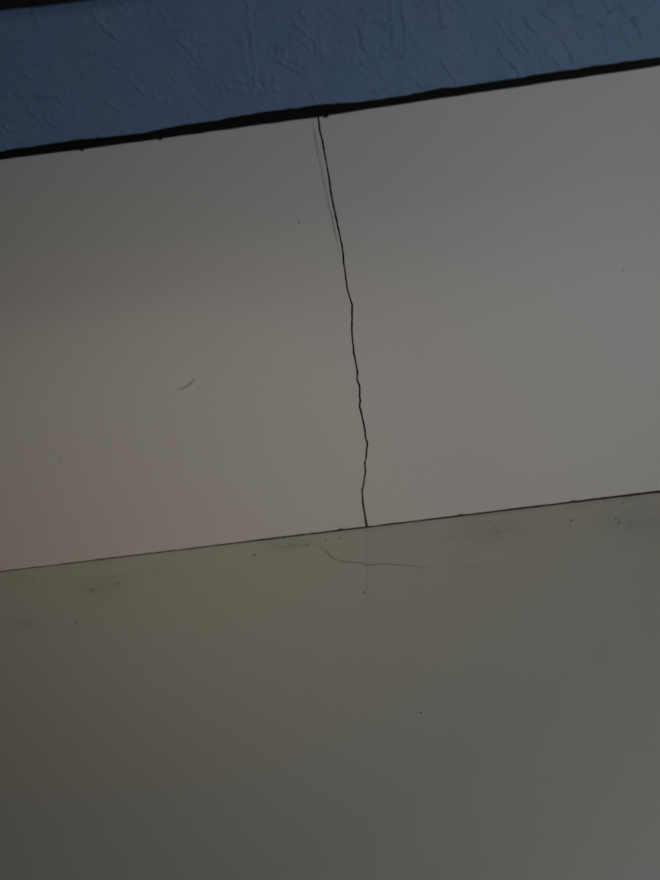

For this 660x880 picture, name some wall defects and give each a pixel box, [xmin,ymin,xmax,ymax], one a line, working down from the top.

crack [0,117,660,572]